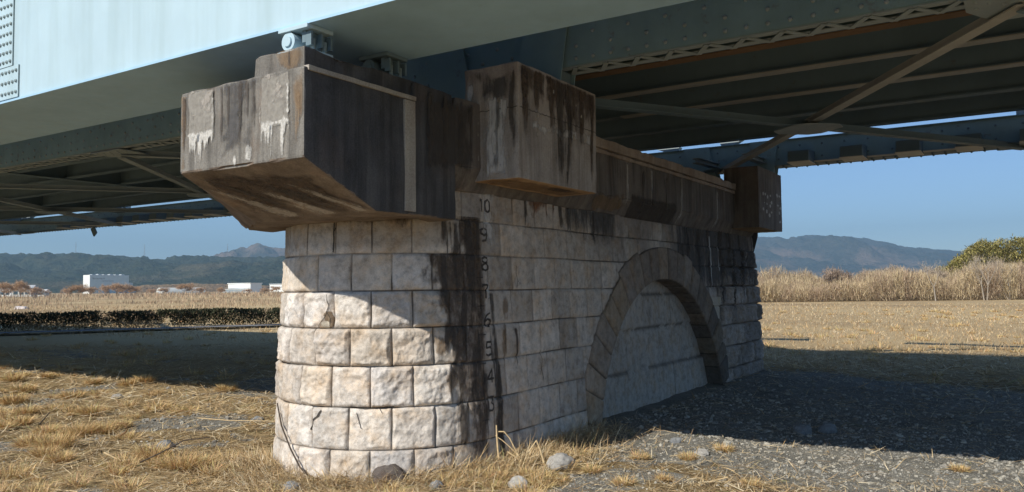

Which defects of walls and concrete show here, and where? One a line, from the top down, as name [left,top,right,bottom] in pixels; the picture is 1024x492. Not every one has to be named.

water stain [220,80,255,164]
water stain [428,65,595,184]
water stain [558,163,757,306]
water stain [424,216,505,459]